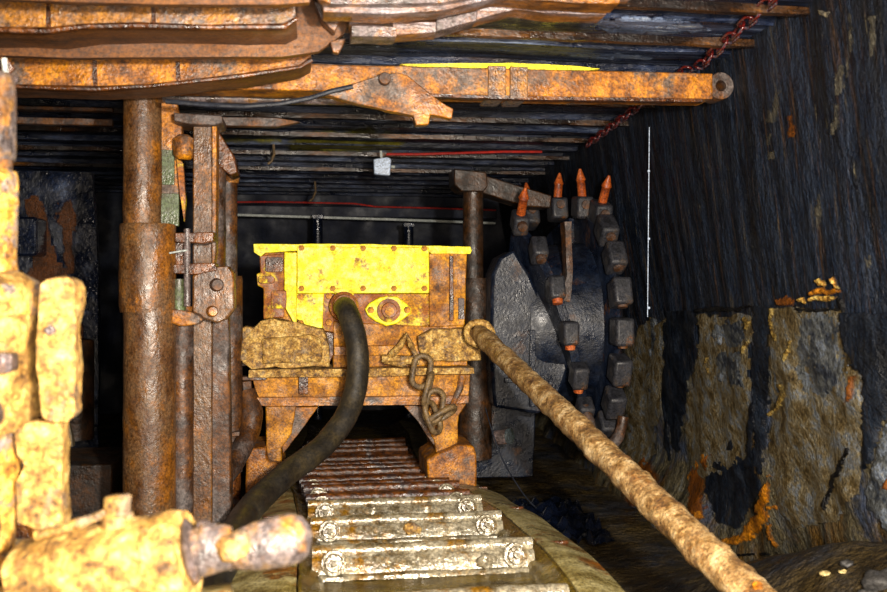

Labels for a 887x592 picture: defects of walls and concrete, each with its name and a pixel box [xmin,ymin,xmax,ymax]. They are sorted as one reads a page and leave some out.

corrosion [25,195,77,284]
corrosion [721,476,778,548]